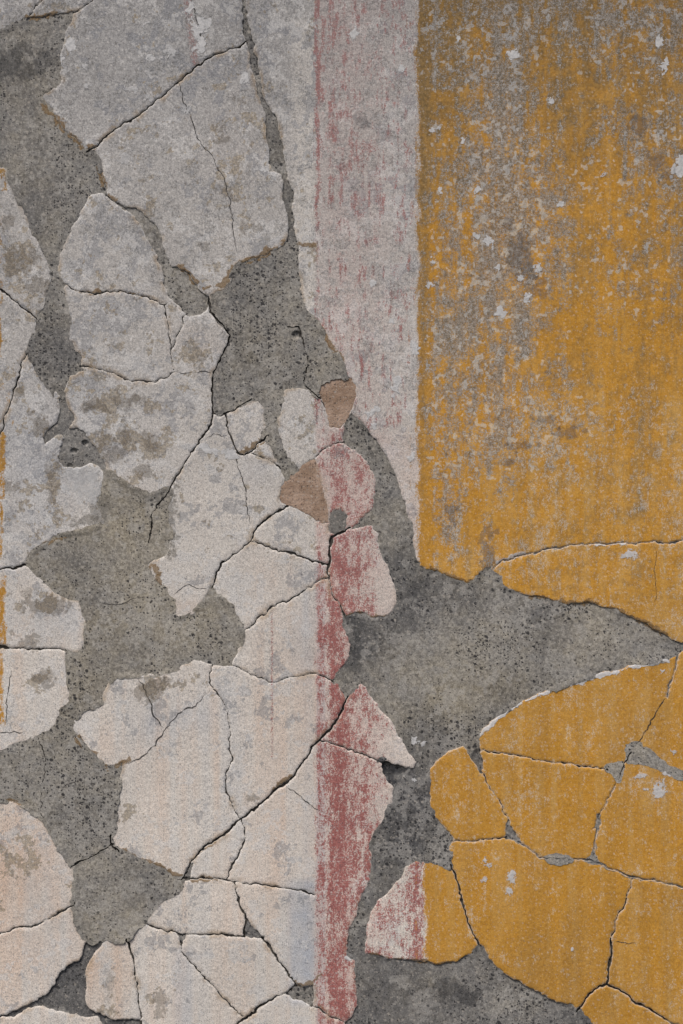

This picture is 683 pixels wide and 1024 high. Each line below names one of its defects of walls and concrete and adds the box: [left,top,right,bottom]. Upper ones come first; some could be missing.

crack [87,0,248,247]
crack [0,562,25,570]
crack [0,353,28,435]
crack [0,289,37,319]
crack [0,644,67,652]
crack [0,902,75,934]
crack [72,835,119,866]
spalling [0,0,349,1024]
crack [62,283,350,630]
crack [126,664,379,1024]
spalling [331,414,683,1024]
crack [450,654,683,1024]